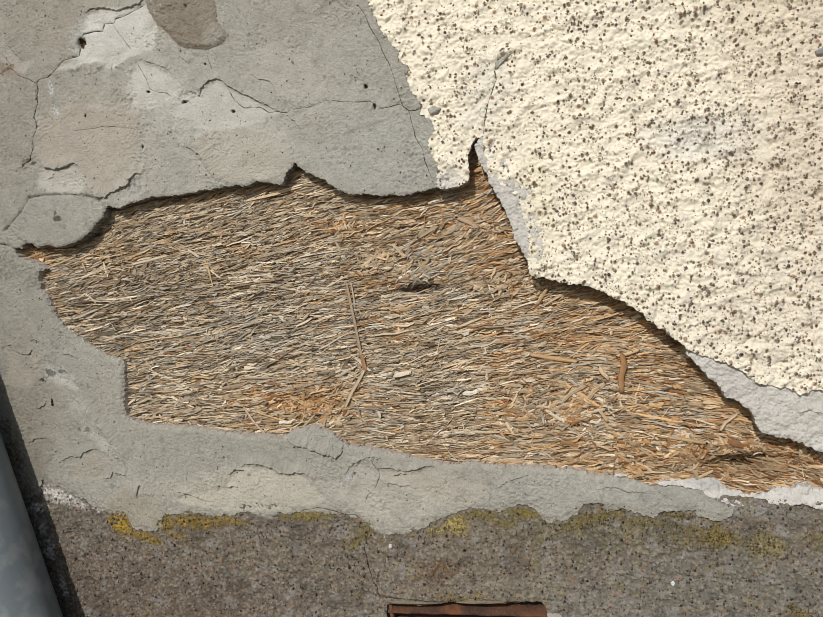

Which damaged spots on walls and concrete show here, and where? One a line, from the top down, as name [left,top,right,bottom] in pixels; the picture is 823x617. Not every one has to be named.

crack [0,6,169,167]
crack [229,5,435,186]
spalling [15,136,823,510]